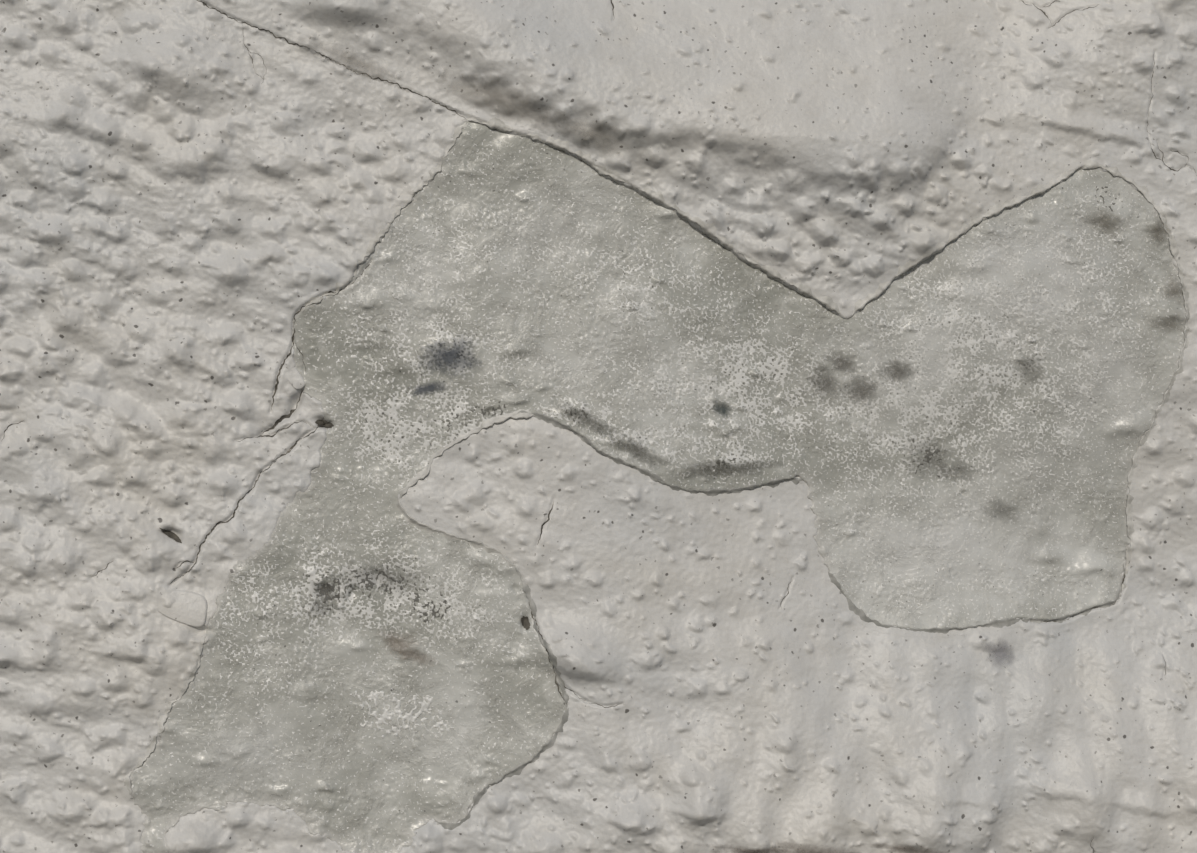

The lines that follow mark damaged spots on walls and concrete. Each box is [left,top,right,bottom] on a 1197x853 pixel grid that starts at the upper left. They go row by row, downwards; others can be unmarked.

peeling [124,117,1190,853]